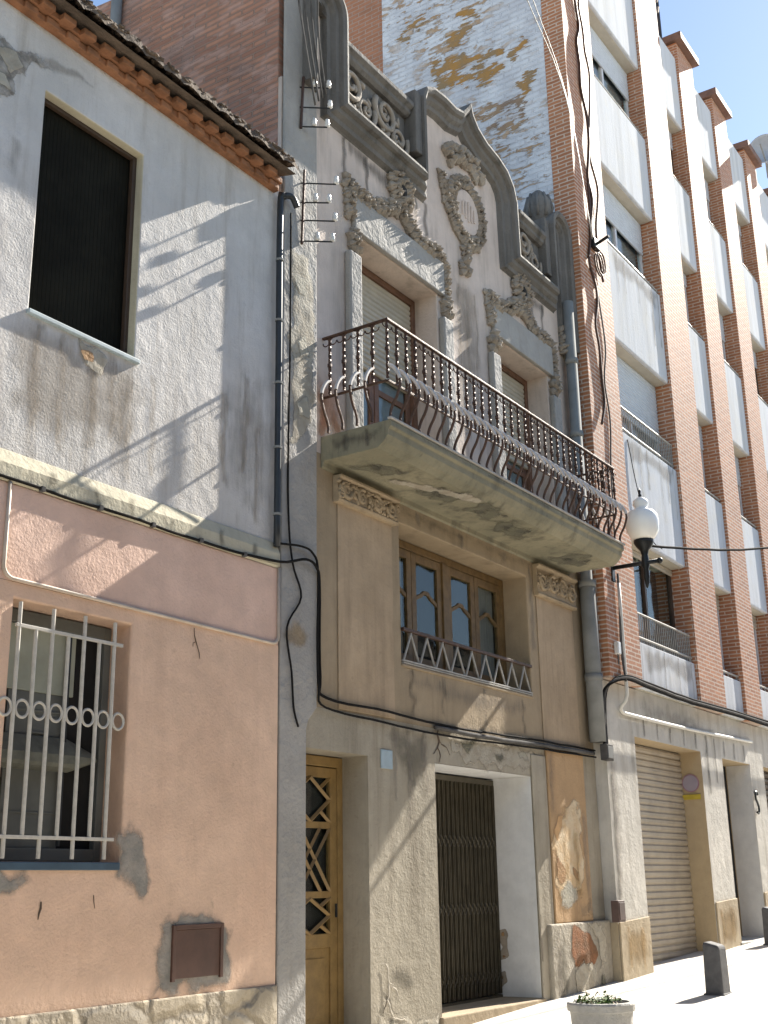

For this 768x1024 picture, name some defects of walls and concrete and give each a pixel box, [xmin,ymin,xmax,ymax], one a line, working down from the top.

peeling [396,13,428,44]
peeling [429,6,531,90]
peeling [473,68,538,162]
flaking render [79,339,108,376]
crack [433,730,450,762]
peeling [551,800,584,908]
flaking render [572,922,606,993]